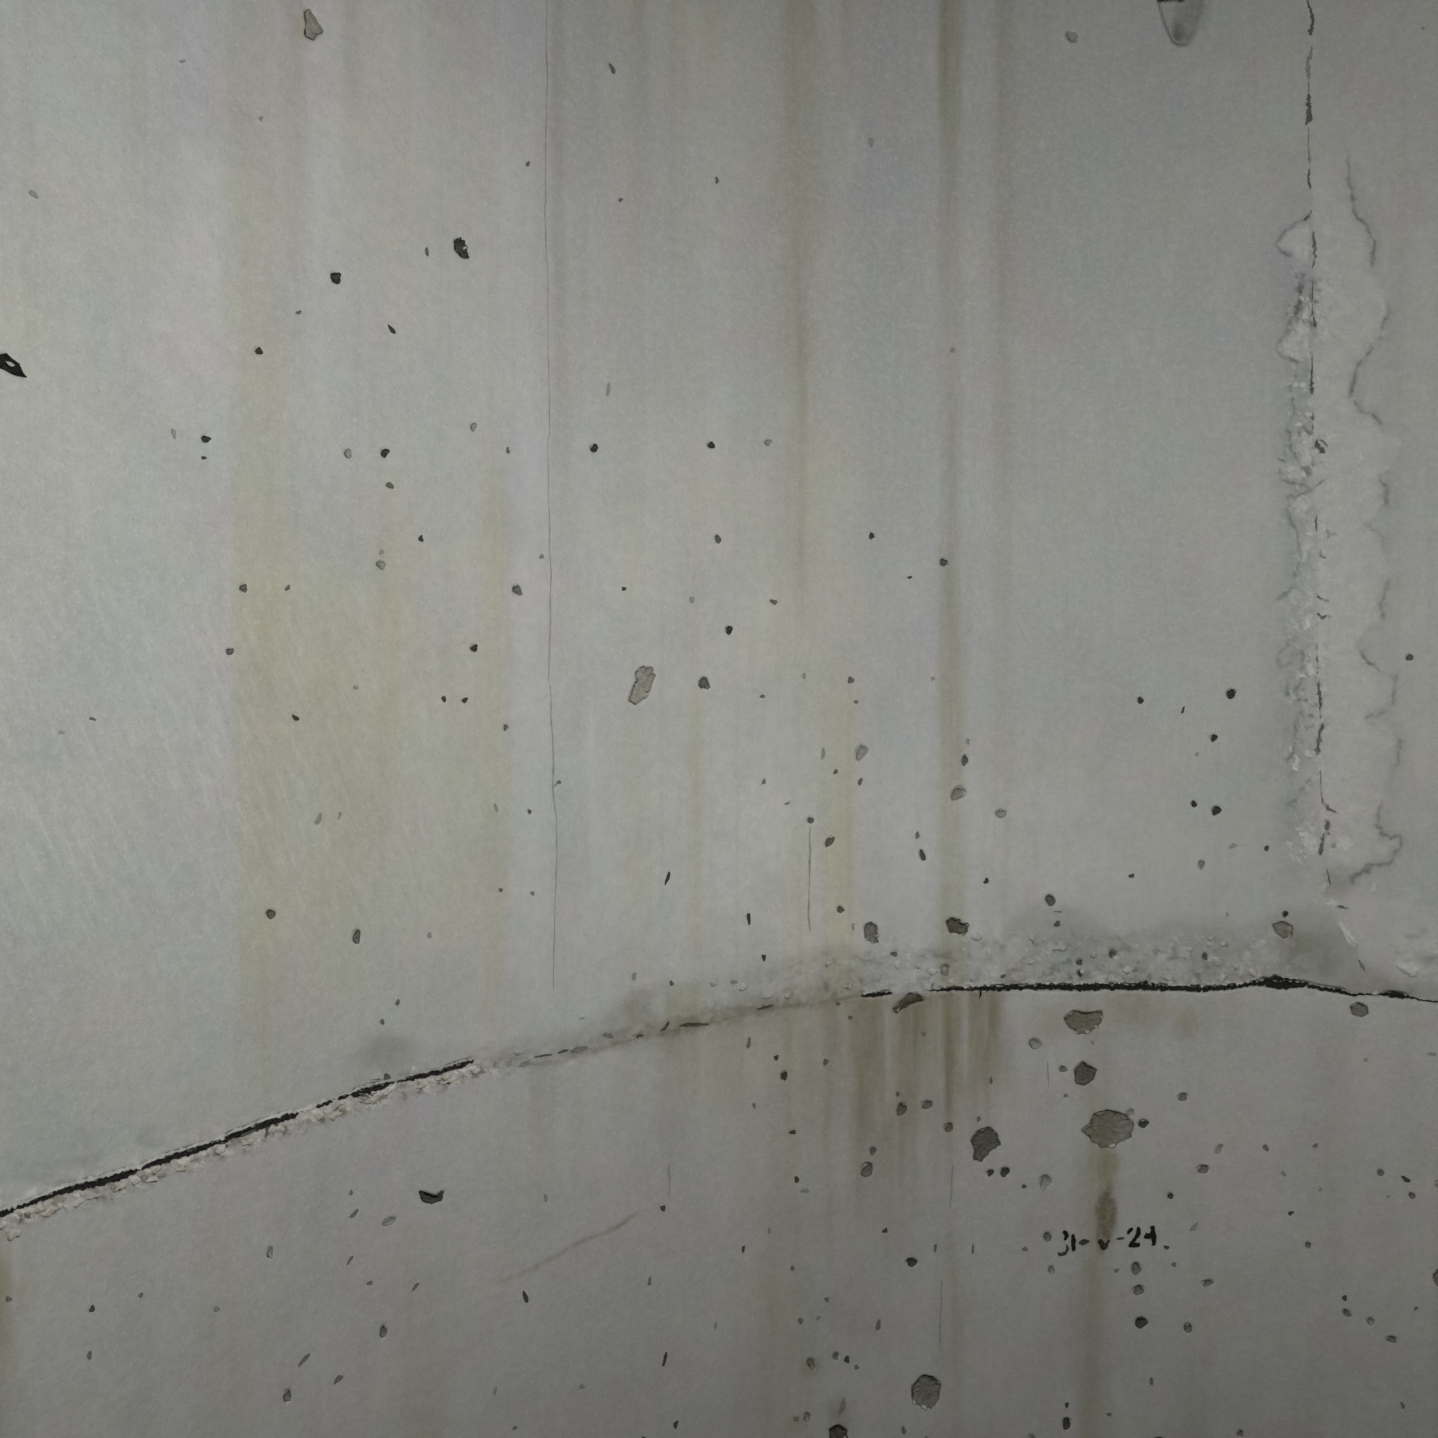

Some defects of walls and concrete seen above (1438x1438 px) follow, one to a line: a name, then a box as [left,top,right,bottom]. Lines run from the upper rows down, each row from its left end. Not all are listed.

crack [1304,0,1337,558]
crack [1314,596,1348,909]
crack [860,991,893,999]
leakage [894,934,1258,991]
crack [929,959,1438,1003]
crack [519,1021,709,1067]
crack [0,1060,474,1219]